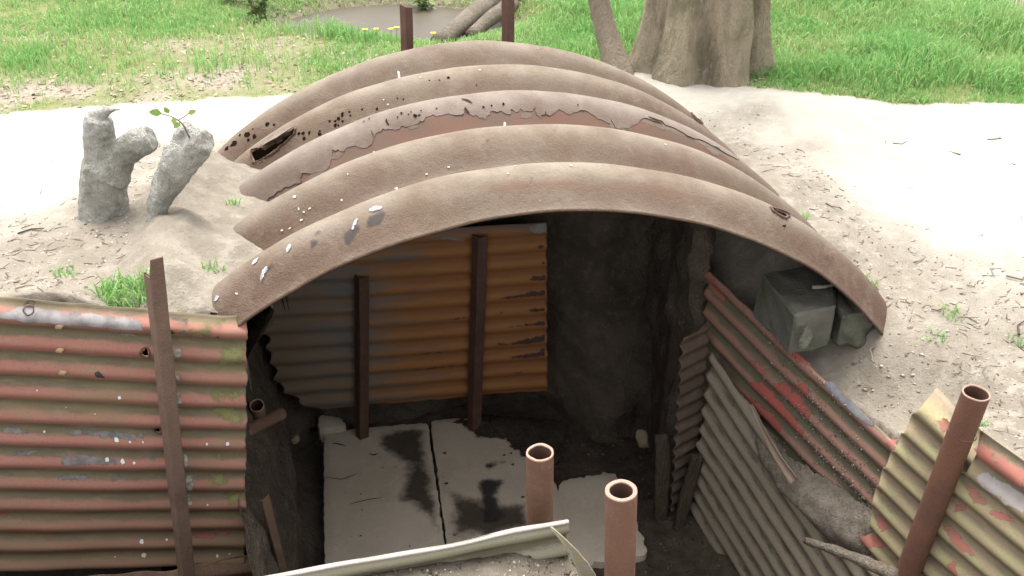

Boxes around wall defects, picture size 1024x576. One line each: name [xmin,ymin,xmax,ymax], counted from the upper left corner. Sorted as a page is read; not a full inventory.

spalling [297,107,378,140]
corrosion [239,90,739,202]
peeling [0,307,143,331]
spalling [775,326,812,365]
peeling [744,360,810,437]
peeling [823,382,875,426]
leakage [382,430,434,513]
leakage [456,480,526,534]
peeling [859,513,890,548]
peeling [944,526,975,576]
peeling [955,473,1024,522]